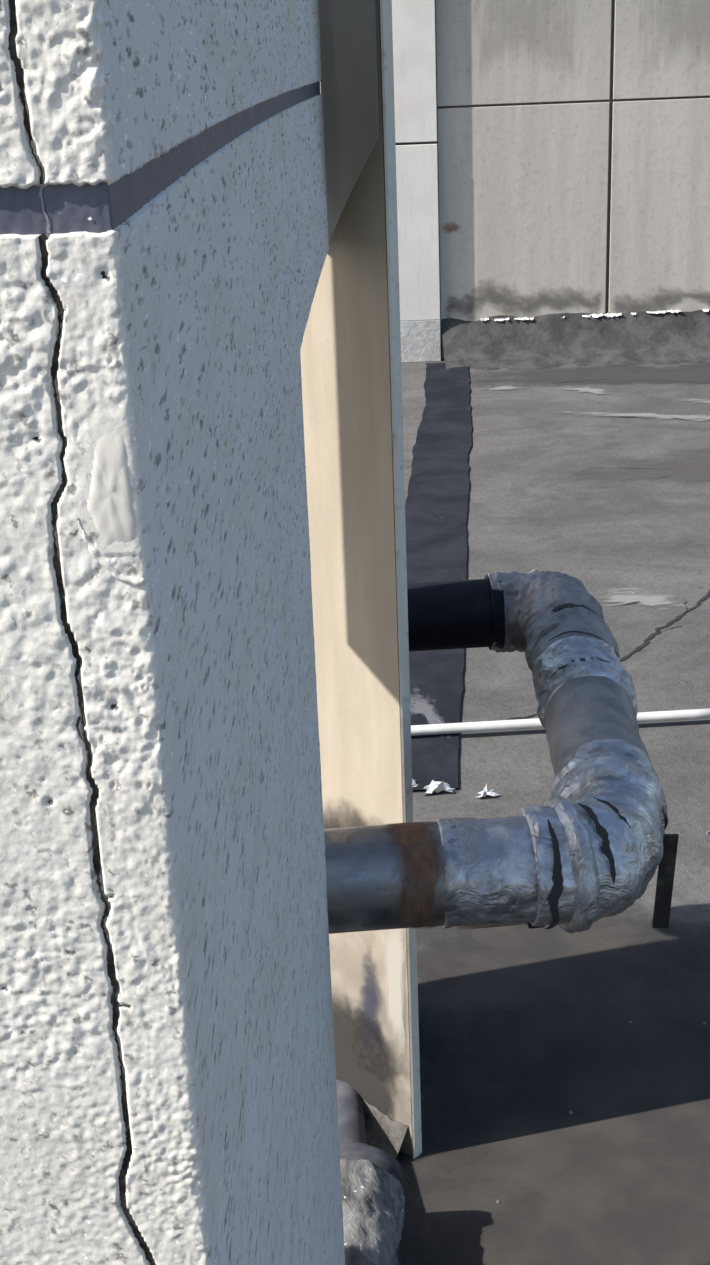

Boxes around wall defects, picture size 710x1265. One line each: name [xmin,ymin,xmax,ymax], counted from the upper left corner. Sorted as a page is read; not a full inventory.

leakage [447,289,599,312]
leakage [615,294,710,313]
crack [8,0,156,1265]
crack [620,590,710,661]